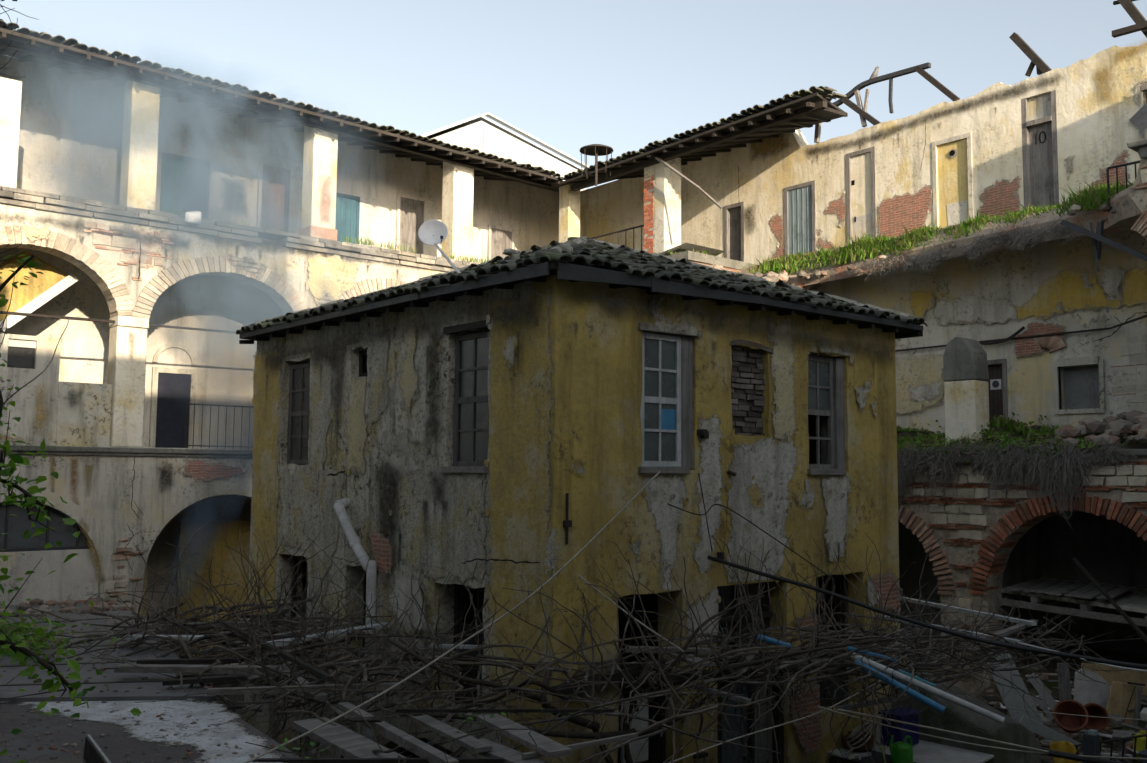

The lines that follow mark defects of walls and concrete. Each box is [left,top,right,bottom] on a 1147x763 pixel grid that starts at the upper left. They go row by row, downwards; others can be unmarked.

flaking render [823,191,846,228]
flaking render [877,184,933,238]
flaking render [978,176,1022,217]
water stain [378,463,401,556]
peeling [367,426,488,635]
peeling [641,313,855,647]